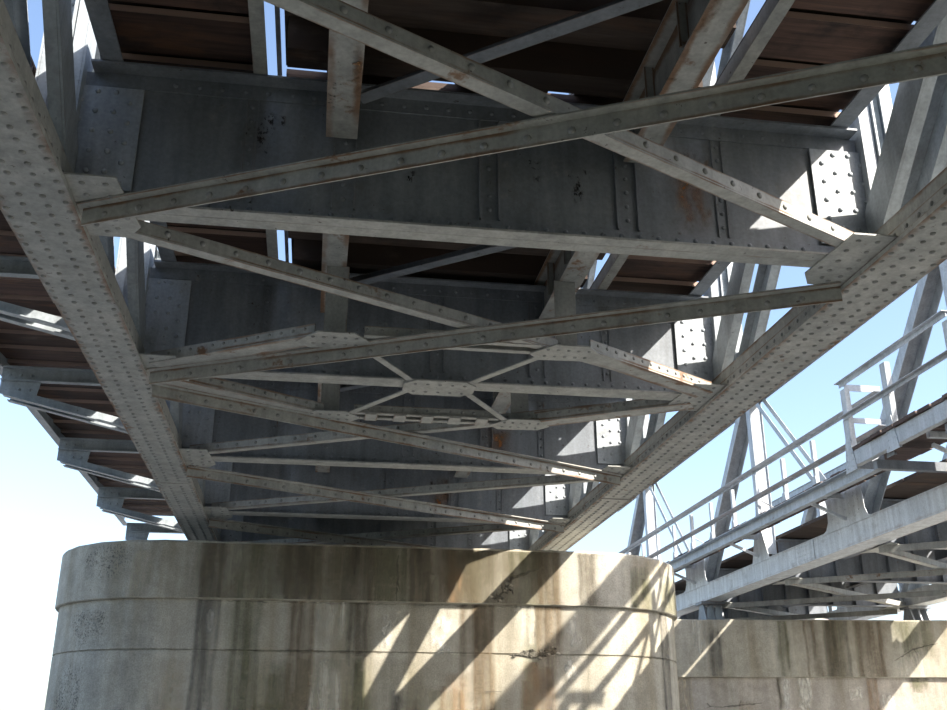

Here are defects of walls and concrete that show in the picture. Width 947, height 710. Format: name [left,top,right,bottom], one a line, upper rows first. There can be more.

damp [521,552,558,664]